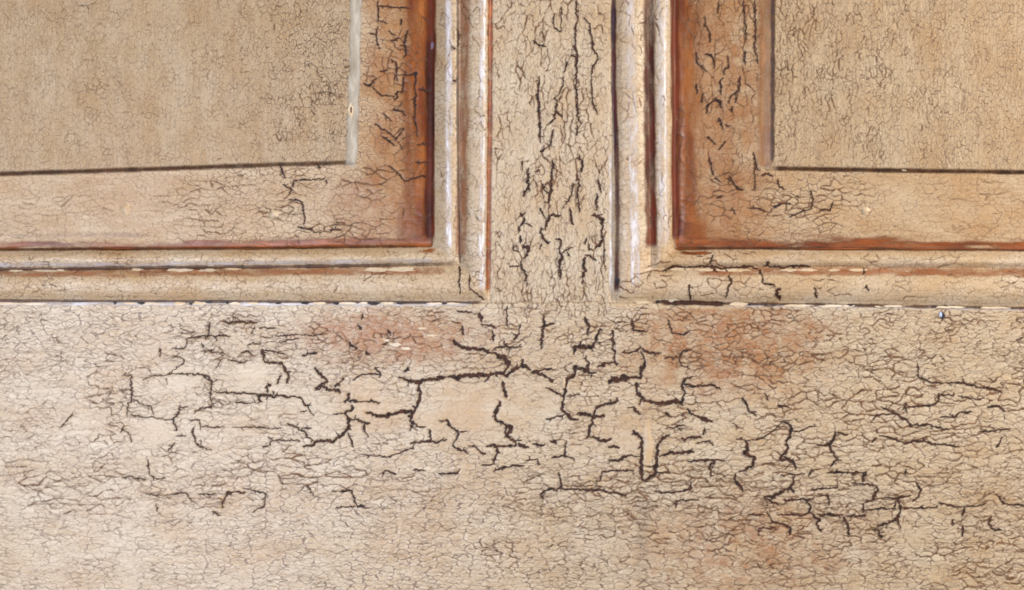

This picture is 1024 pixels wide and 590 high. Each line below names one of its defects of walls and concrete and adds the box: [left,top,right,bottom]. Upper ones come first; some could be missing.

crack [279,164,341,233]
crack [363,0,429,182]
crack [509,0,606,287]
crack [662,255,818,301]
crack [695,0,834,218]
crack [121,266,1024,539]